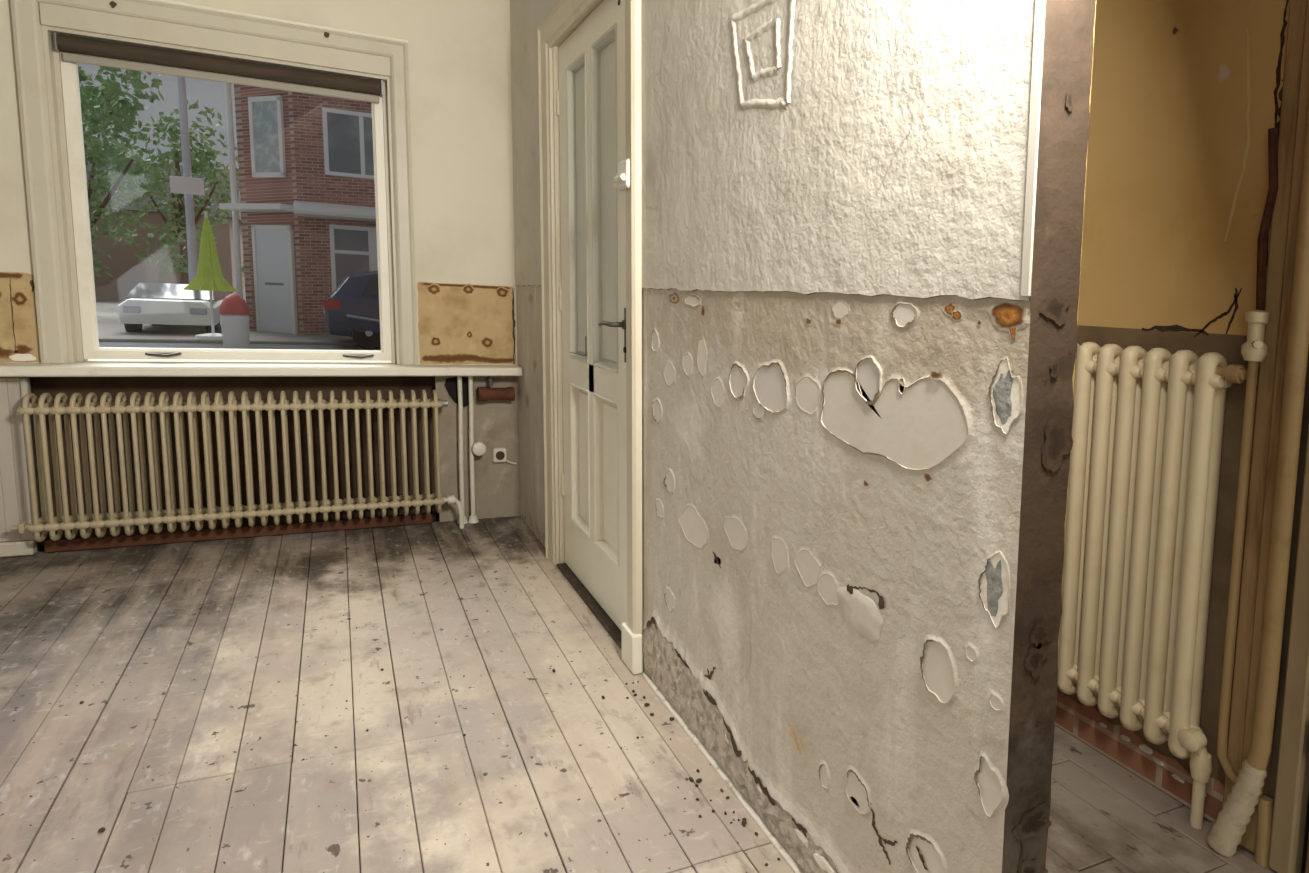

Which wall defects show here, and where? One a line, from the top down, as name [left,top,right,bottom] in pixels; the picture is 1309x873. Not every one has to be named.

crack [1273,0,1289,137]
rust [987,299,1029,341]
flaking render [989,356,1024,436]
flaking render [978,550,1011,629]
flaking render [643,605,860,873]